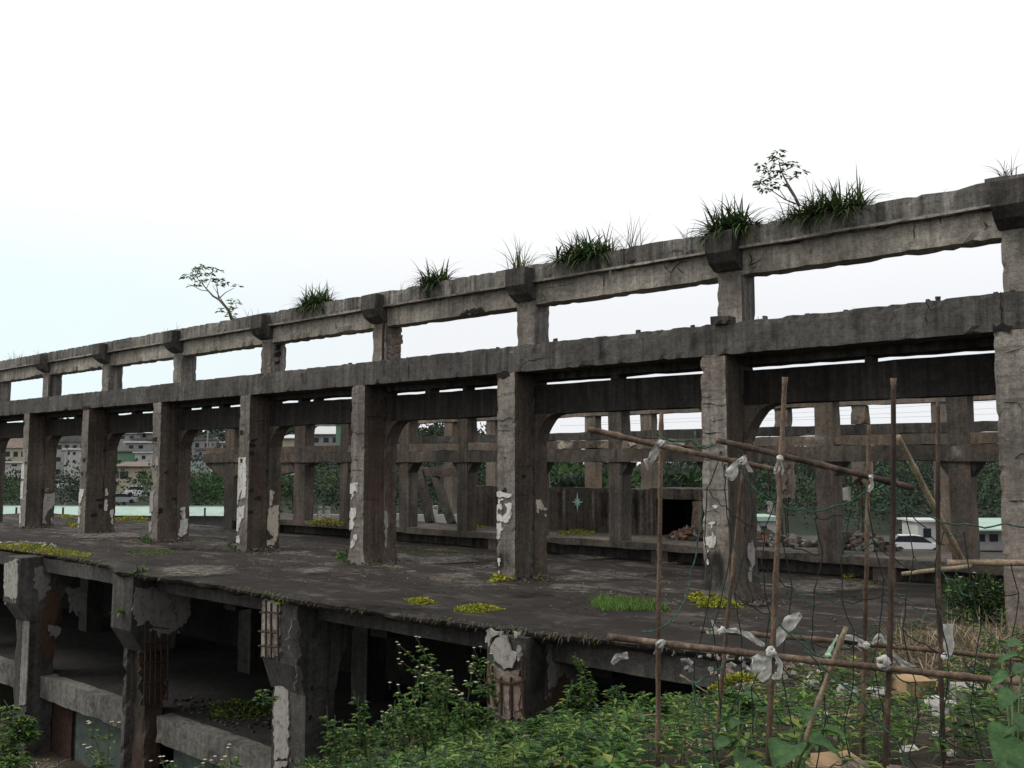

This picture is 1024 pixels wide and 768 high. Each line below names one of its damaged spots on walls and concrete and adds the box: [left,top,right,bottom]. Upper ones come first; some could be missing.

peeling [149,482,188,539]
peeling [236,430,279,547]
peeling [349,482,358,548]
peeling [497,487,512,539]
flaking render [3,559,19,605]
flaking render [33,566,52,602]
flaking render [66,586,88,616]
flaking render [48,625,61,639]
flaking render [131,587,191,706]
flaking render [258,599,313,768]
spalling [485,628,526,720]